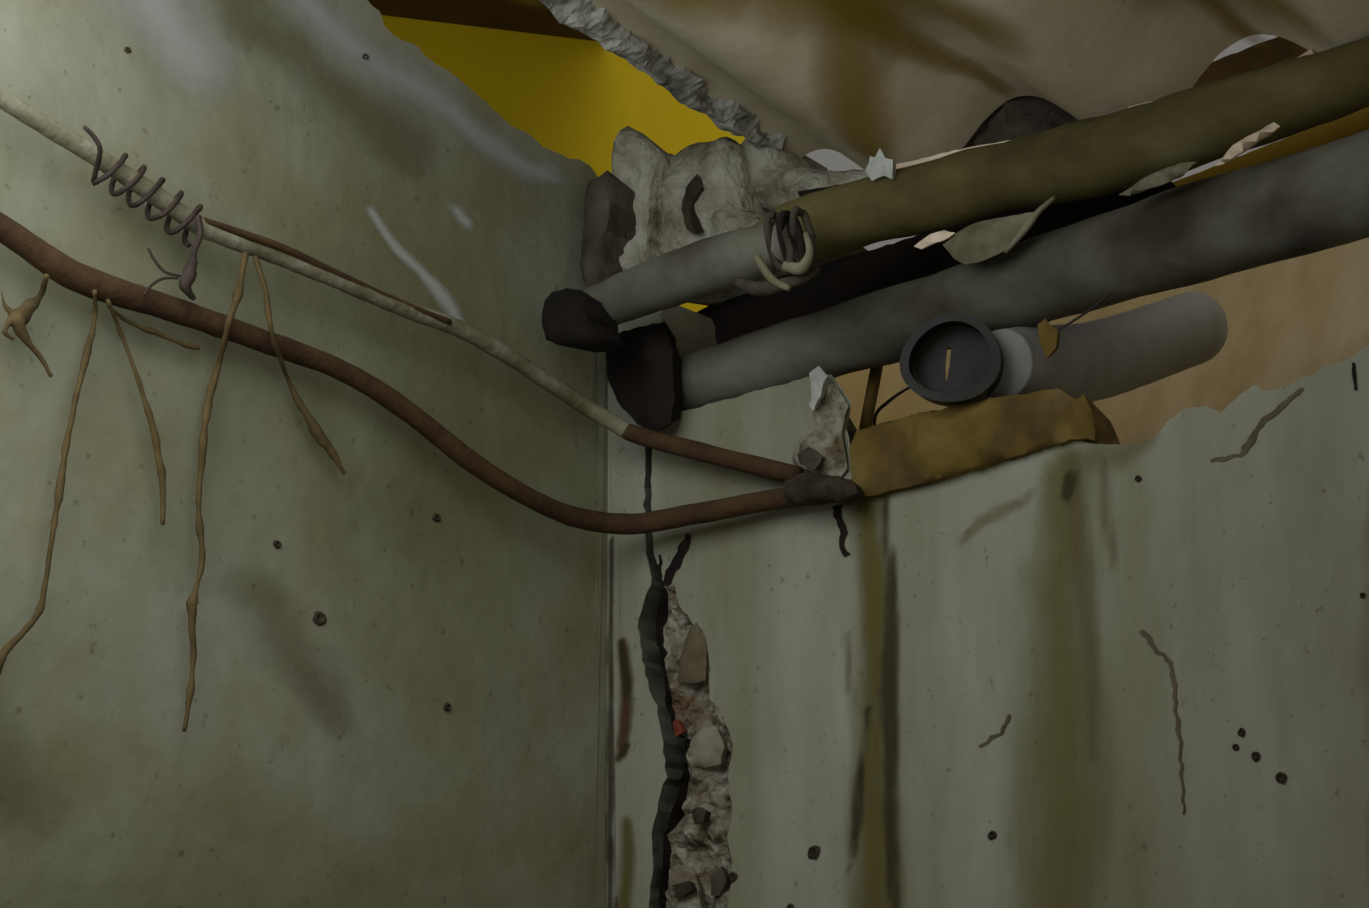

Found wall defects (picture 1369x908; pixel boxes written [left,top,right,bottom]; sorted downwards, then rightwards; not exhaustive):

crack [1211,387,1303,462]
crack [638,448,691,908]
spalling [663,584,738,908]
crack [1139,629,1185,815]